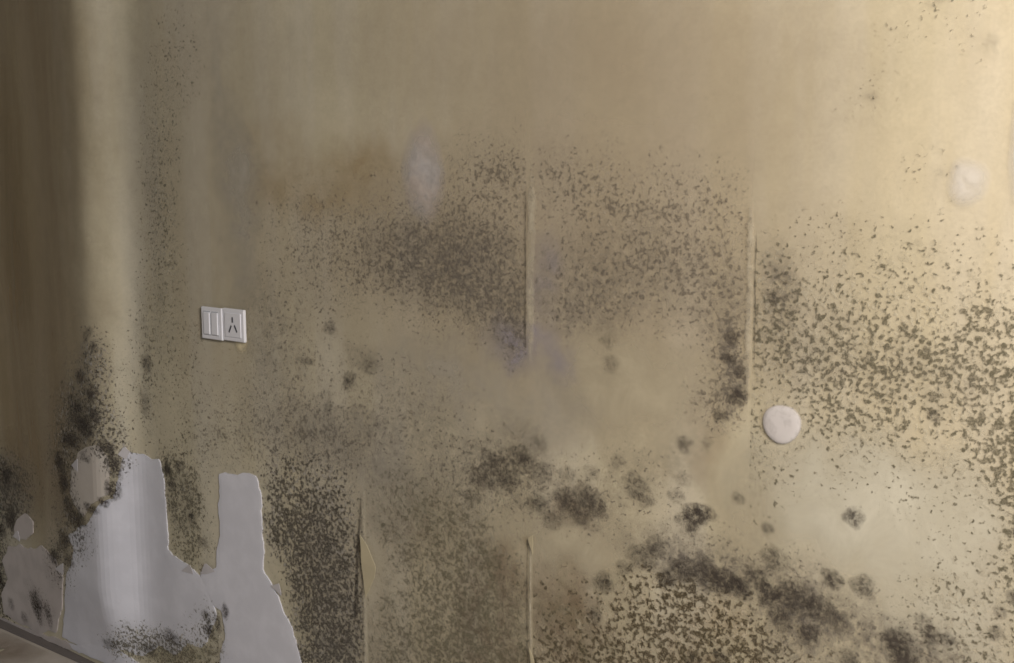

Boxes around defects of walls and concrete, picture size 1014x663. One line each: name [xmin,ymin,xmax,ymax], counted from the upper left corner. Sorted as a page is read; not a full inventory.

peeling [0,445,302,663]
water stain [0,0,427,663]
water stain [272,144,1014,663]